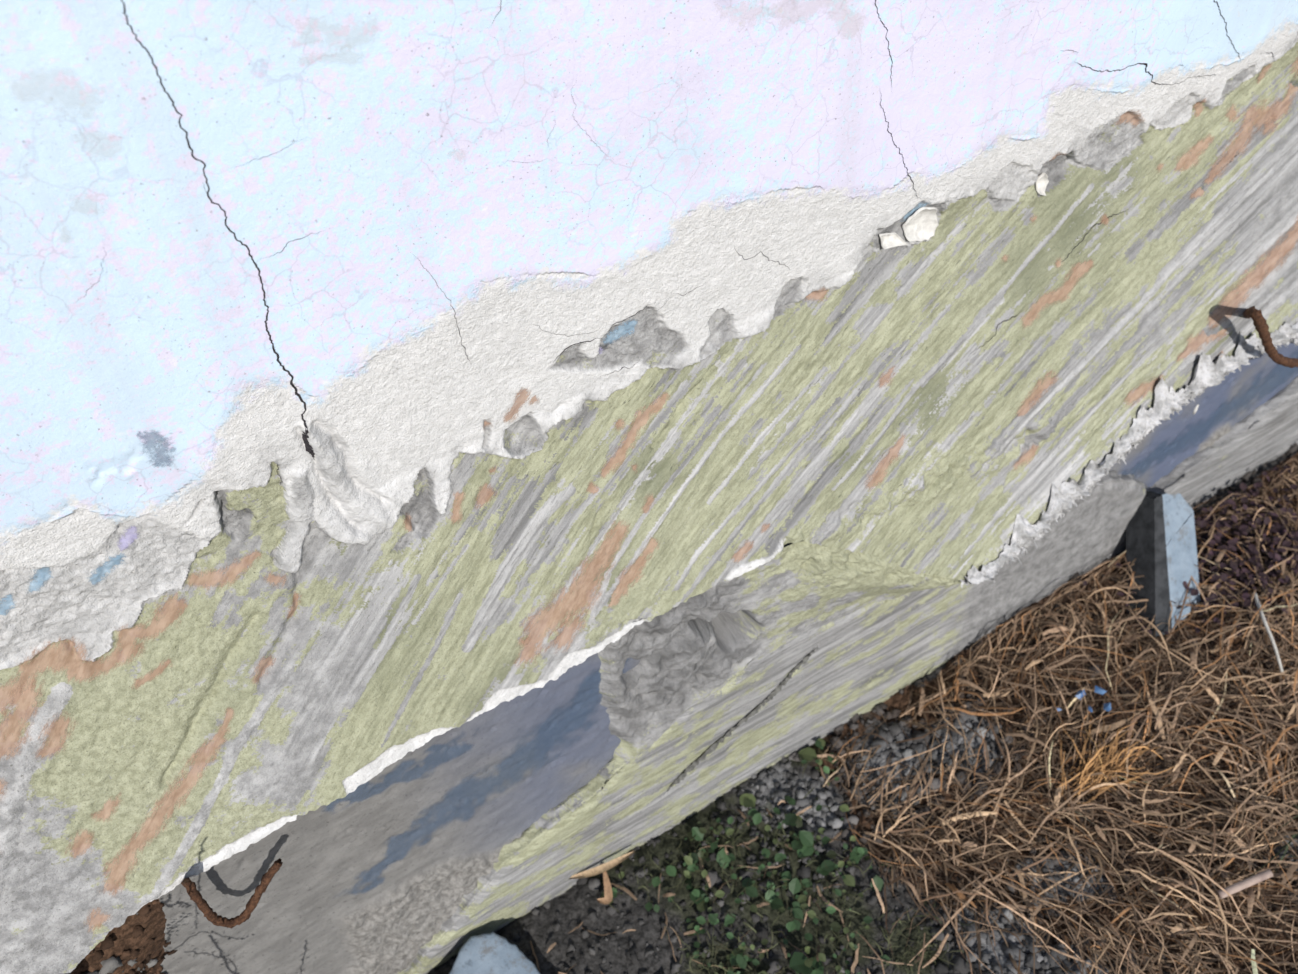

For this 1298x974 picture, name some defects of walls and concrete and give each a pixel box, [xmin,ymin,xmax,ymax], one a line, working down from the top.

crack [875,0,921,199]
crack [1060,0,1274,85]
crack [121,0,315,459]
spalling [548,305,739,373]
flaking render [872,200,950,251]
corrosion [1177,217,1298,360]
spalling [1243,306,1298,368]
spalling [0,490,256,670]
damp [137,432,174,466]
spalling [390,468,438,554]
damp [960,322,1298,588]
spalling [341,538,787,796]